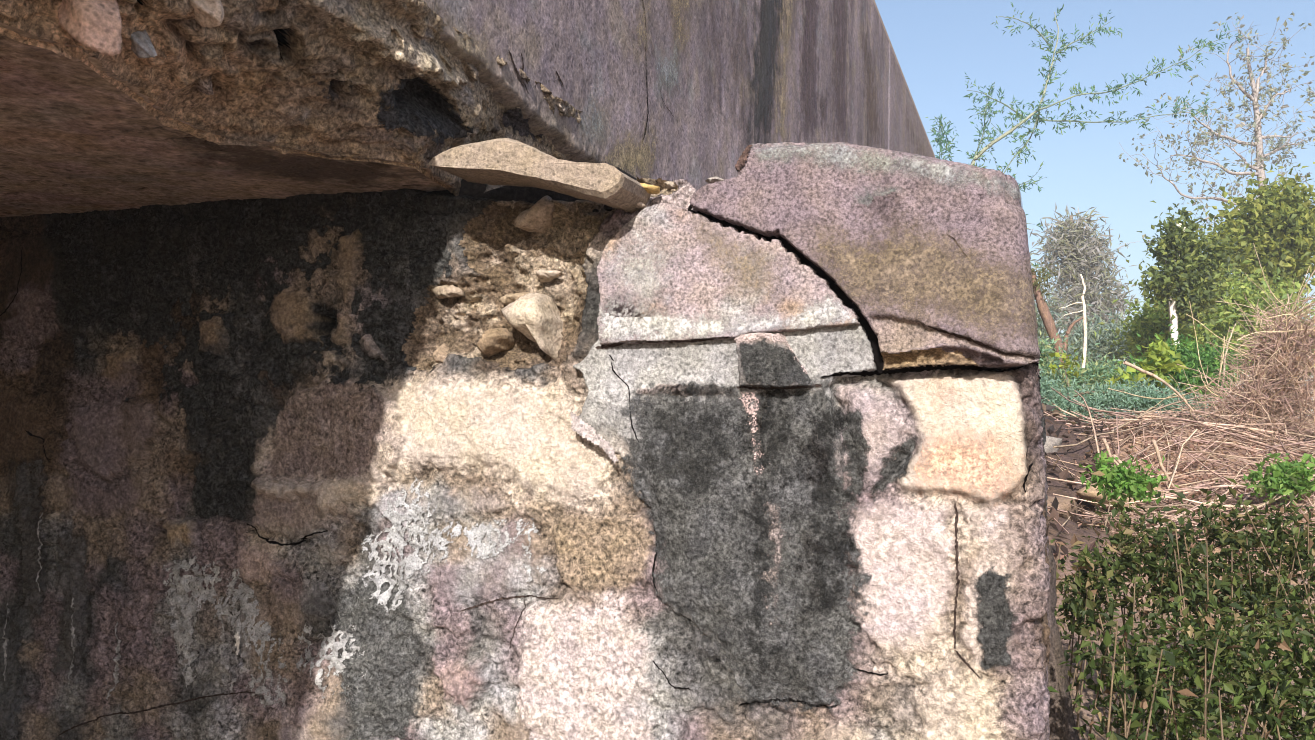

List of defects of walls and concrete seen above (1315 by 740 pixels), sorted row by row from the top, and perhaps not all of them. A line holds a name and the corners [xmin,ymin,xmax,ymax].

spalling [0,0,583,196]
crack [642,0,673,146]
damp [705,0,852,144]
spalling [636,176,678,197]
damp [46,137,496,437]
spalling [402,200,616,373]
crack [688,205,1042,390]
damp [192,448,249,522]
damp [598,223,1037,713]
crack [1023,453,1048,493]
crack [953,503,980,678]